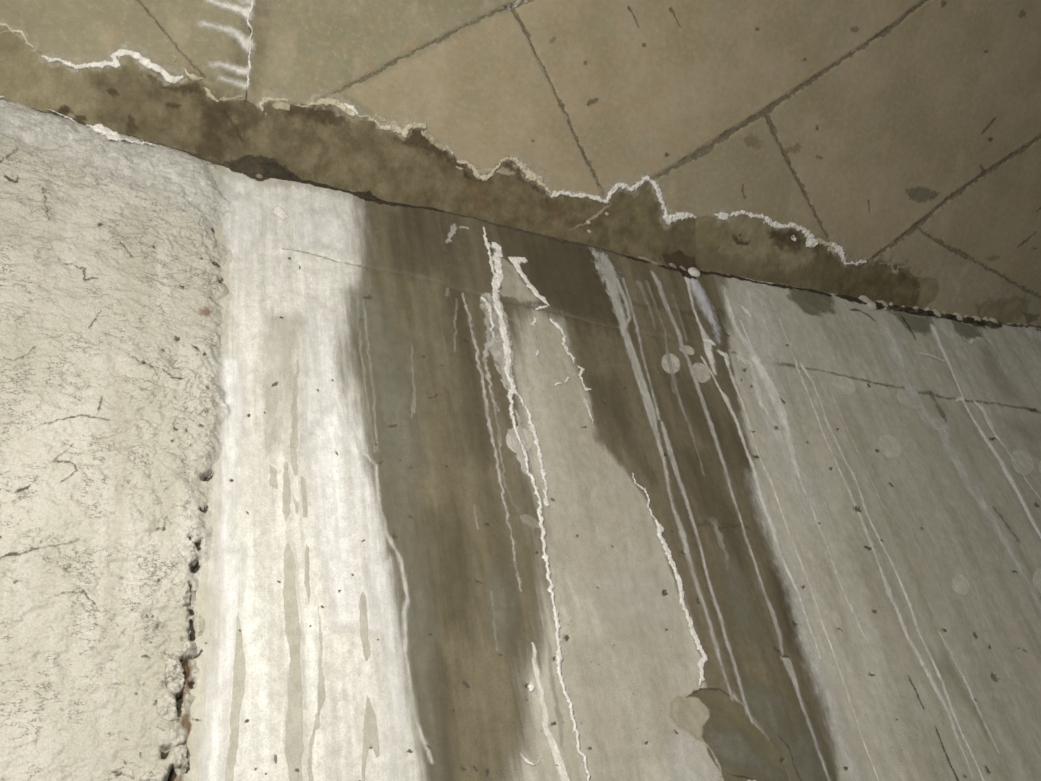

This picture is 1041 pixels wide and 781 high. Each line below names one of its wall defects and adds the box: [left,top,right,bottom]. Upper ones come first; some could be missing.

water stain [0,22,33,48]
water stain [0,26,244,164]
spalling [859,295,1003,328]
spalling [115,536,206,781]
water stain [199,94,940,781]
water stain [793,358,985,781]
water stain [878,311,1041,608]
water stain [939,632,999,753]